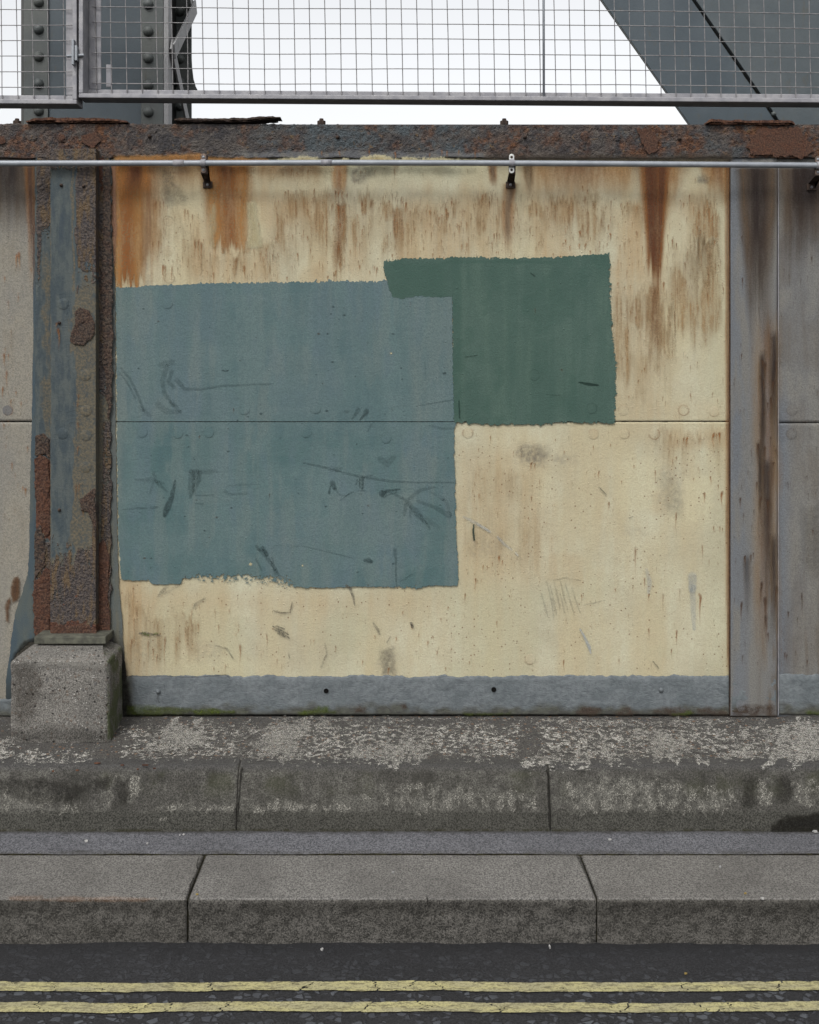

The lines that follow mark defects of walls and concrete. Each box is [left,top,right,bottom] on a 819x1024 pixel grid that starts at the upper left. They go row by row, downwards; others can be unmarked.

corrosion [174,116,282,124]
corrosion [111,154,290,288]
corrosion [277,166,369,278]
corrosion [361,196,415,241]
corrosion [488,153,732,381]
leakage [253,792,371,815]
leakage [384,782,537,815]
leakage [566,772,736,816]
leakage [771,779,819,832]